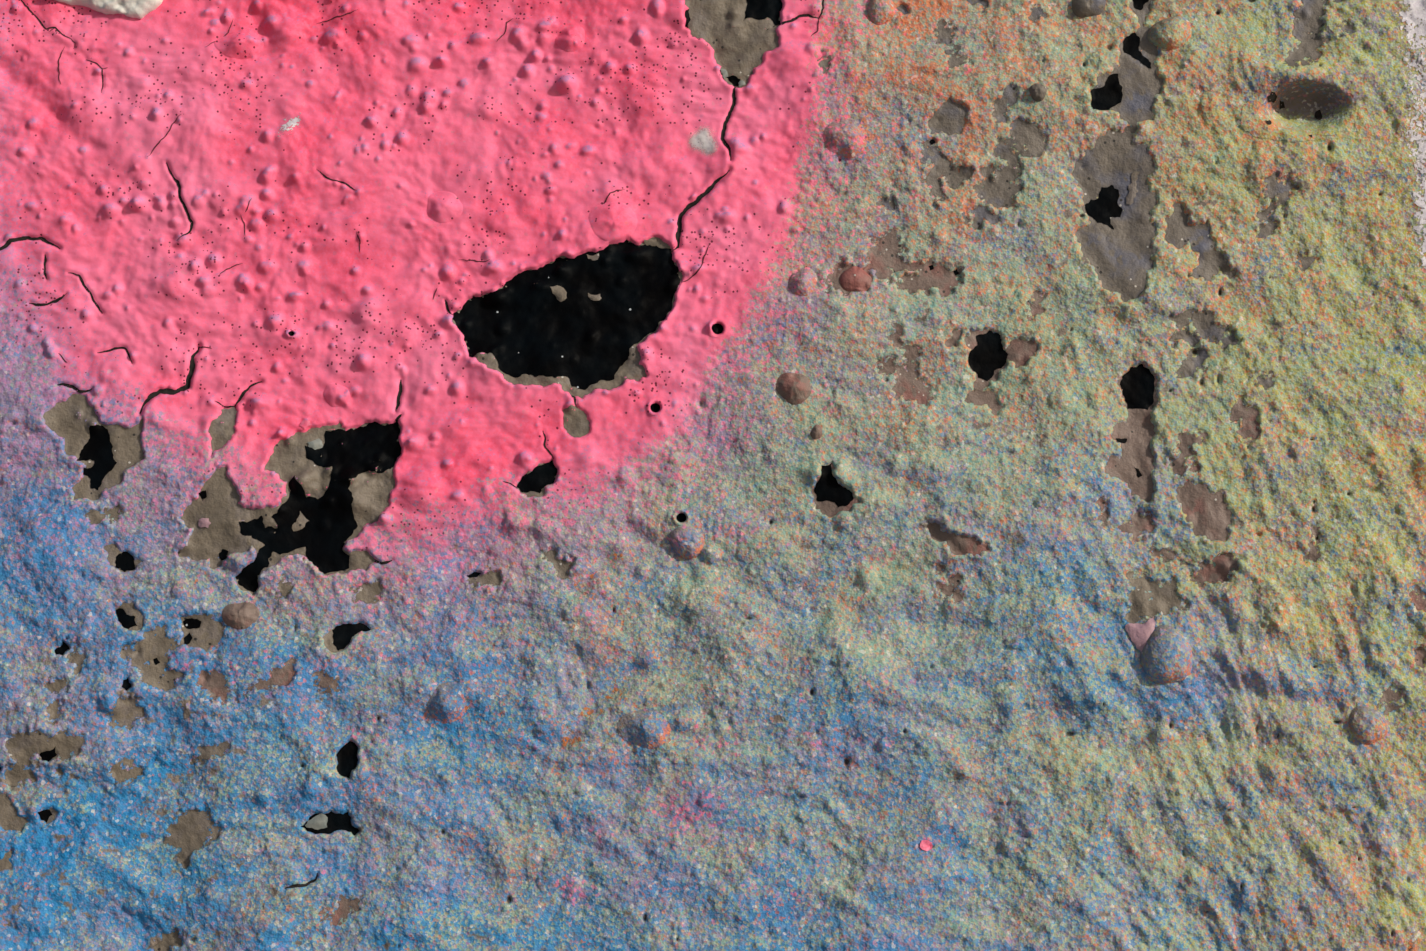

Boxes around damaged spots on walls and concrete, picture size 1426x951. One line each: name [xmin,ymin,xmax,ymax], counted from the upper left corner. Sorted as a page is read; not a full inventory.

peeling [685,0,783,88]
crack [149,114,193,238]
crack [671,87,736,282]
peeling [1072,0,1236,302]
crack [0,236,102,313]
peeling [43,394,144,524]
crack [57,347,133,393]
crack [140,347,262,414]
peeling [178,407,401,604]
crack [394,380,402,422]
peeling [452,237,683,437]
peeling [1096,364,1243,652]